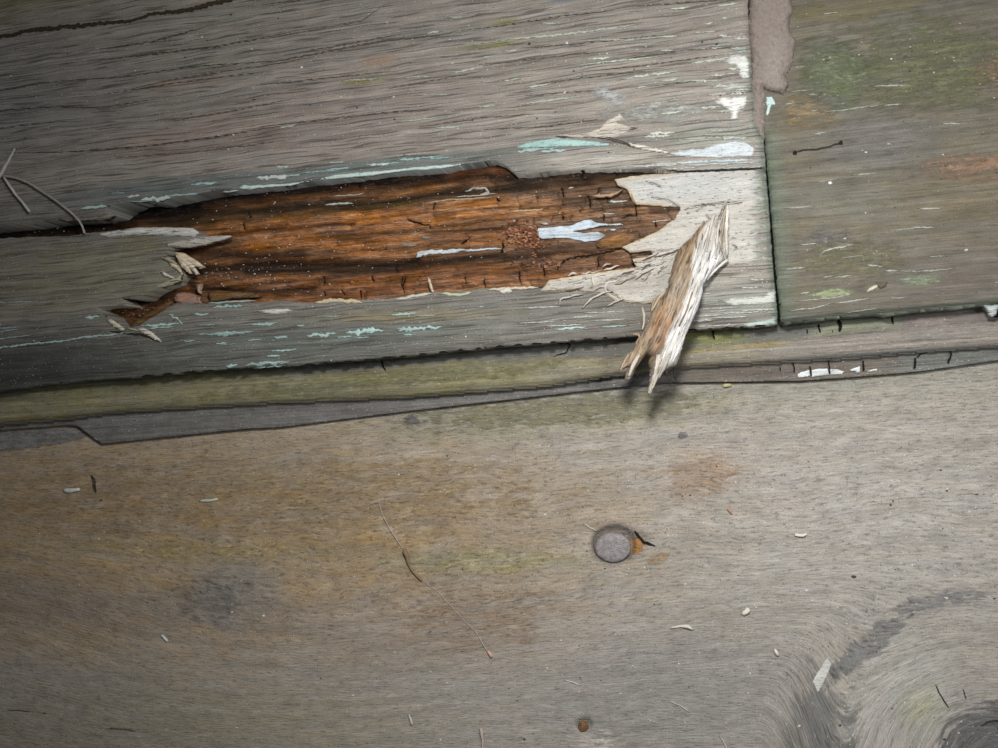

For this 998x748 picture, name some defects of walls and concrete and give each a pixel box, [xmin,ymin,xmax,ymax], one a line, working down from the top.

peeling [473,22,678,52]
peeling [575,49,673,66]
peeling [623,2,750,119]
crack [0,0,737,158]
peeling [766,89,817,116]
spalling [0,130,776,368]
peeling [800,243,953,272]
peeling [791,292,877,313]
rust [630,537,646,553]